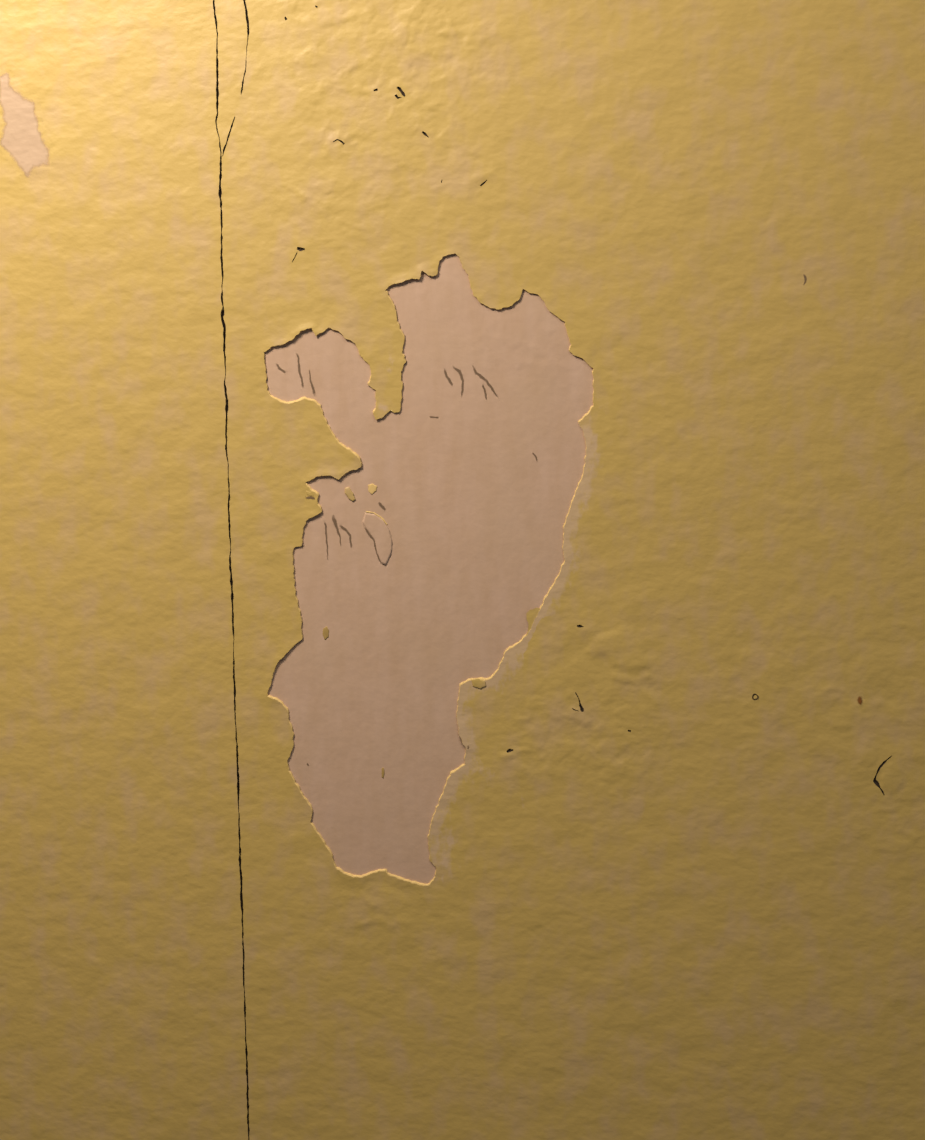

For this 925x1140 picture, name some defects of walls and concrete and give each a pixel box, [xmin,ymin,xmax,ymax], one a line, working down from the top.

crack [213,0,250,1140]
peeling [264,253,594,886]